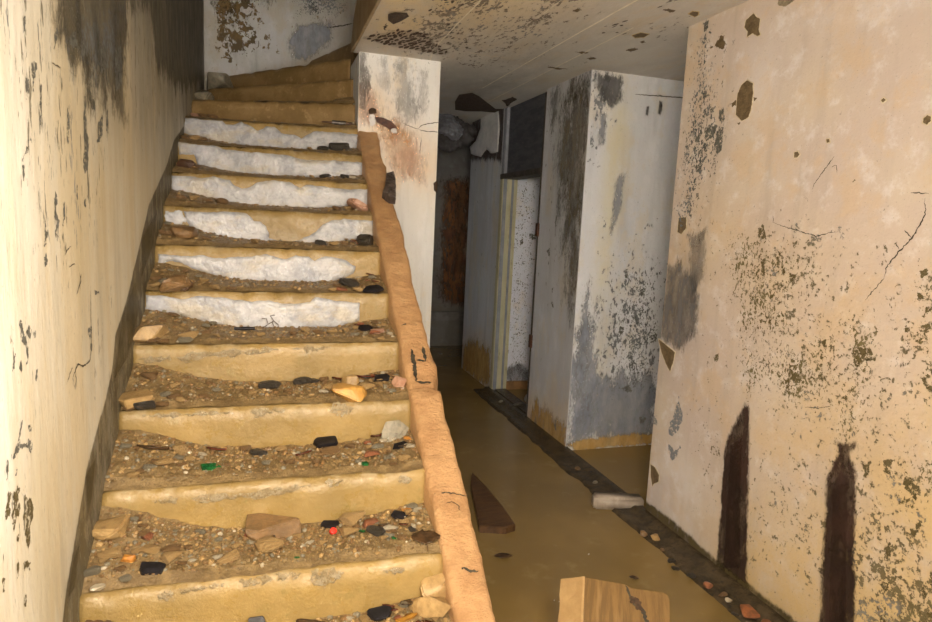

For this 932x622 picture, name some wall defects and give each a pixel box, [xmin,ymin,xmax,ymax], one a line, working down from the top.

damp [52,0,204,118]
damp [289,23,331,60]
flaking render [164,118,373,242]
peeling [672,20,757,236]
crack [68,339,92,382]
flaking render [145,295,360,328]
flaking render [158,254,356,282]
damp [531,70,656,450]
damp [661,233,704,349]
crack [867,192,929,298]
damp [717,406,749,582]
damp [819,443,856,622]